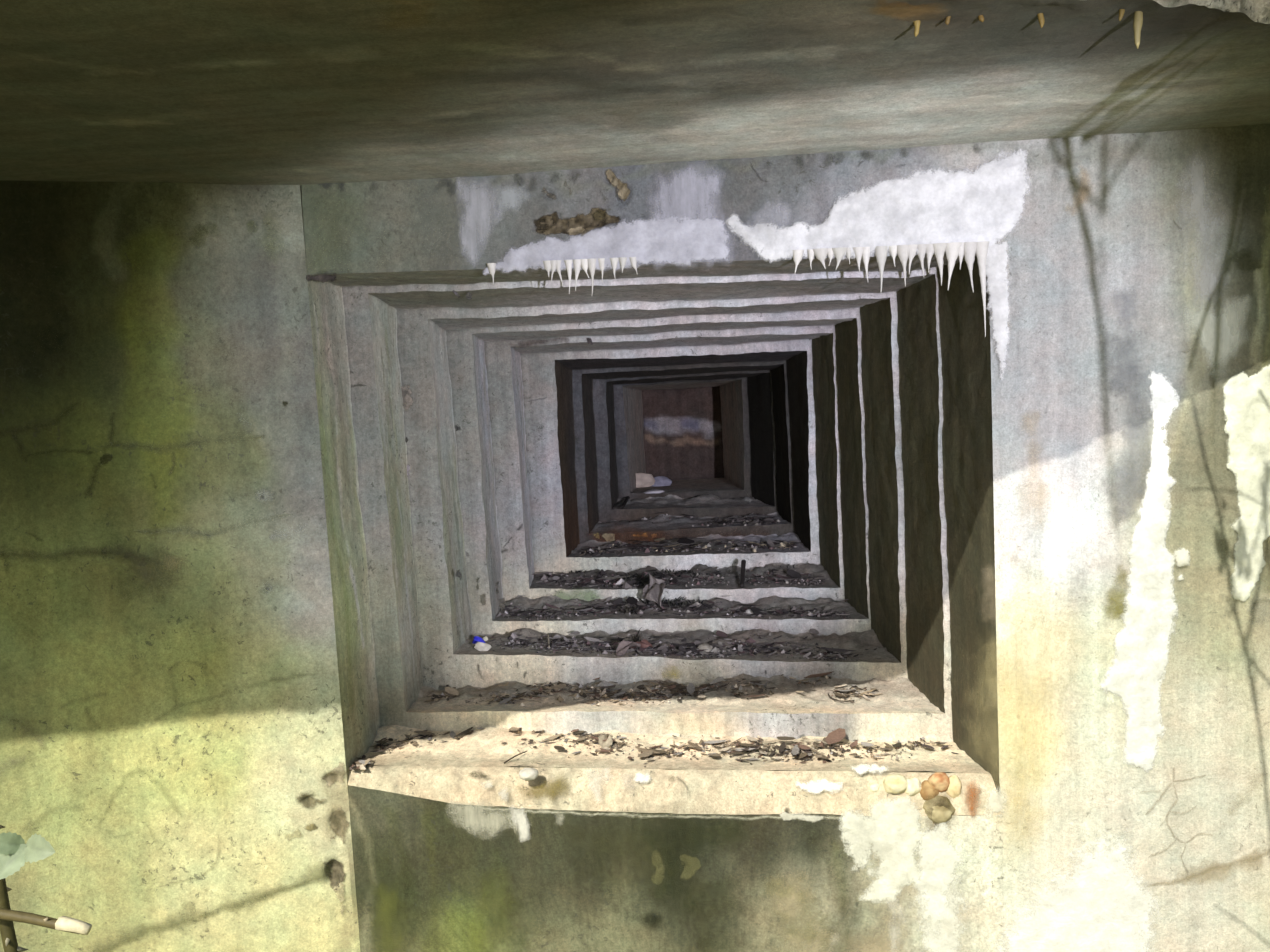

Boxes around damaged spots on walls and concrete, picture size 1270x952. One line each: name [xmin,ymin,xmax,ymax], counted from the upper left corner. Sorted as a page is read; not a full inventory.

damp [445,149,1030,378]
peeling [1223,365,1270,602]
damp [453,775,657,841]
damp [674,797,965,952]
damp [999,836,1157,952]